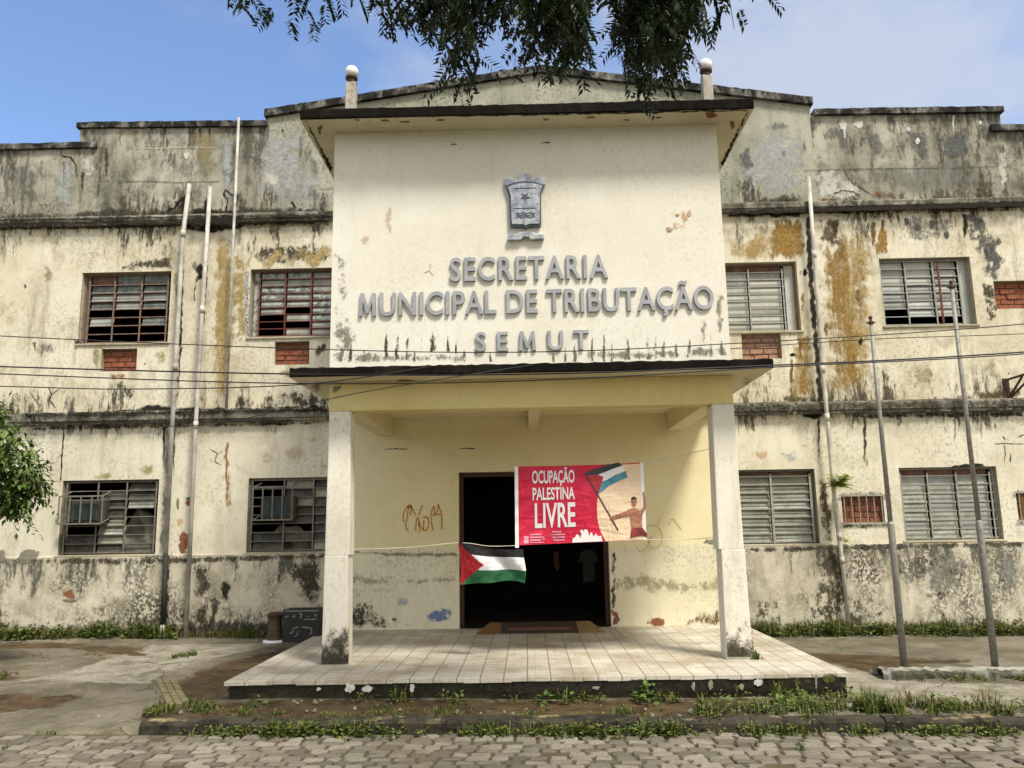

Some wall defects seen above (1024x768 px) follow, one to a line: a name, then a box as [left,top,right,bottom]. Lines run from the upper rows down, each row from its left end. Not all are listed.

peeling [666,210,691,232]
water stain [0,109,1024,637]
flaking render [176,497,190,553]
mould [321,603,396,664]